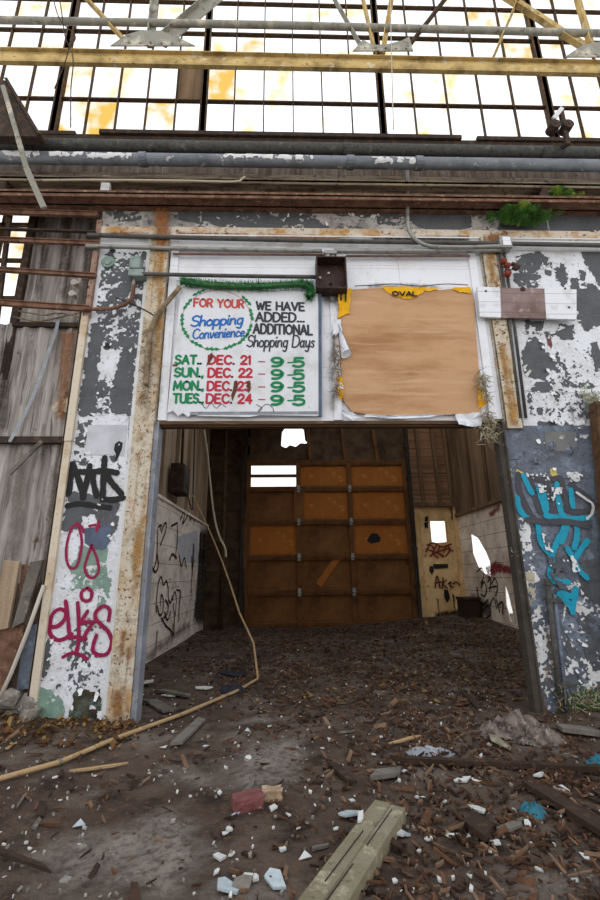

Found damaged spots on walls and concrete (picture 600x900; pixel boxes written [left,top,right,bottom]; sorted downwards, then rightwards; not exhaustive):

peeling [113,211,142,222]
peeling [177,212,329,228]
corrosion [113,208,339,355]
peeling [65,249,147,470]
corrosion [500,343,516,424]
peeling [513,251,600,452]
peeling [510,467,583,505]
peeling [60,491,122,608]
peeling [37,618,104,721]
peeling [511,517,600,710]